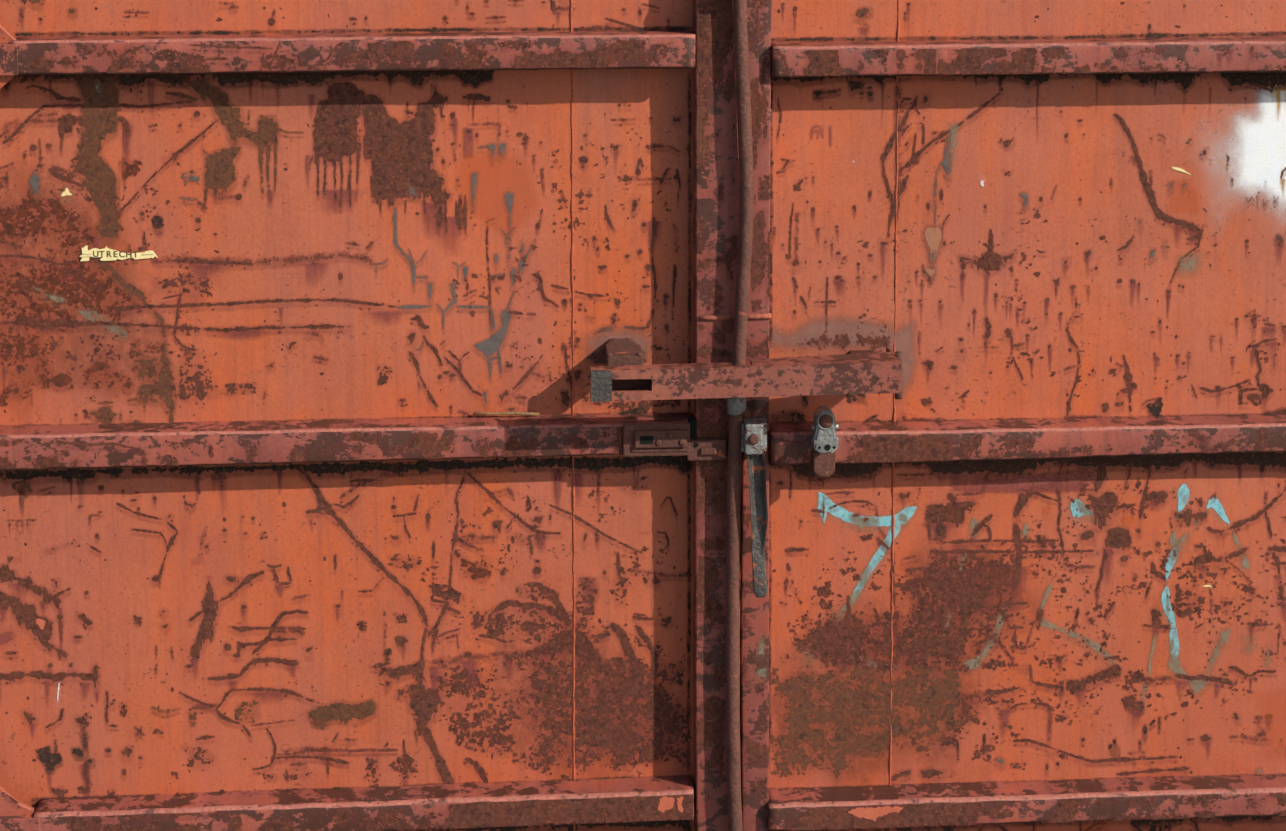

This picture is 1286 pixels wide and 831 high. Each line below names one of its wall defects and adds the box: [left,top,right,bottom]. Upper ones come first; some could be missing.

rust [0,41,479,424]
rust [443,0,815,454]
rust [1131,279,1193,442]
rust [0,556,142,798]
rust [177,570,317,697]
rust [743,387,1286,808]
rust [150,705,215,784]
rust [255,762,312,791]
rust [334,794,693,831]
rust [791,801,1026,831]
rust [1041,794,1220,831]
rust [1245,792,1286,826]